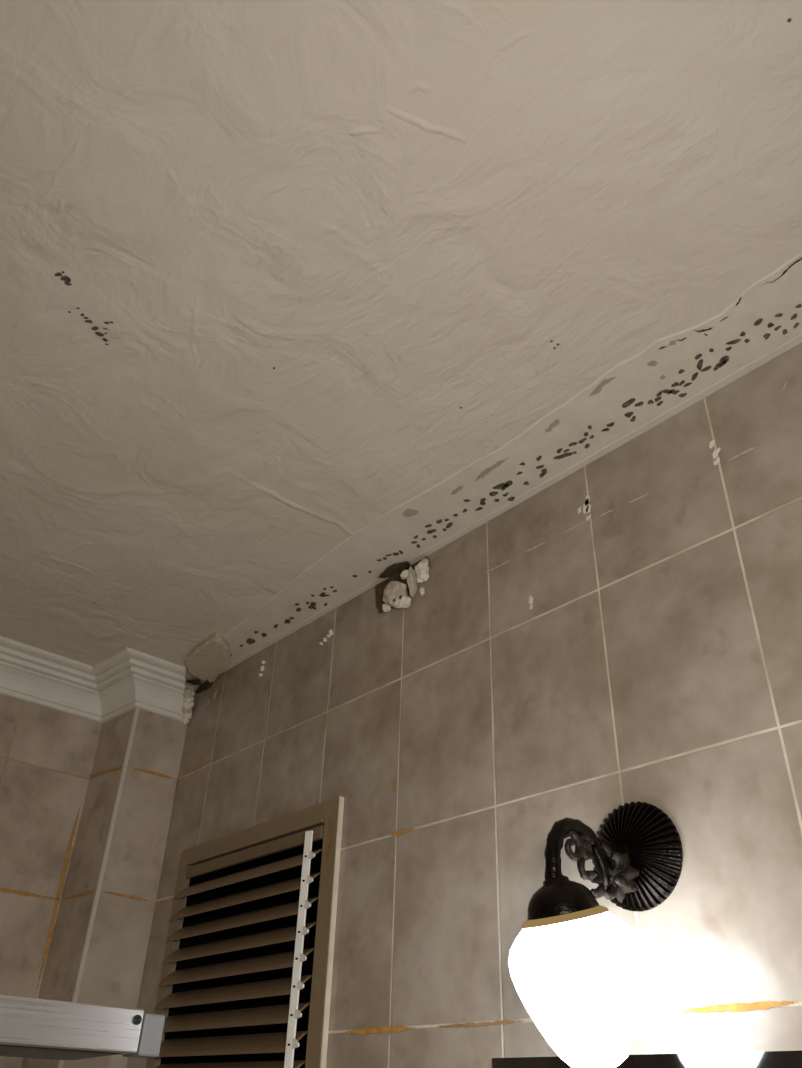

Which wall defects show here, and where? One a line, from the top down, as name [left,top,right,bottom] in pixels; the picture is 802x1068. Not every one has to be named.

crack [766,258,802,283]
crack [660,298,741,349]
peeling [180,252,802,725]